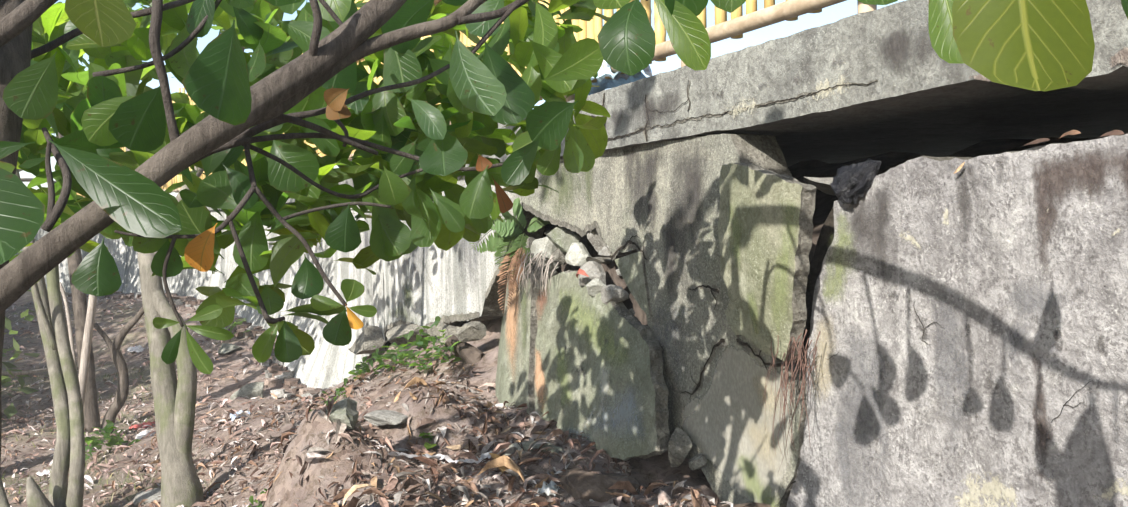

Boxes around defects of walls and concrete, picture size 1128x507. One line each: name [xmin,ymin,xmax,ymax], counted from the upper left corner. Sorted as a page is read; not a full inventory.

crack [589,80,878,141]
water stain [1035,151,1128,260]
crack [611,233,648,266]
rust [506,274,519,358]
crack [680,205,839,398]
rust [535,352,545,403]
water stain [1034,361,1050,460]